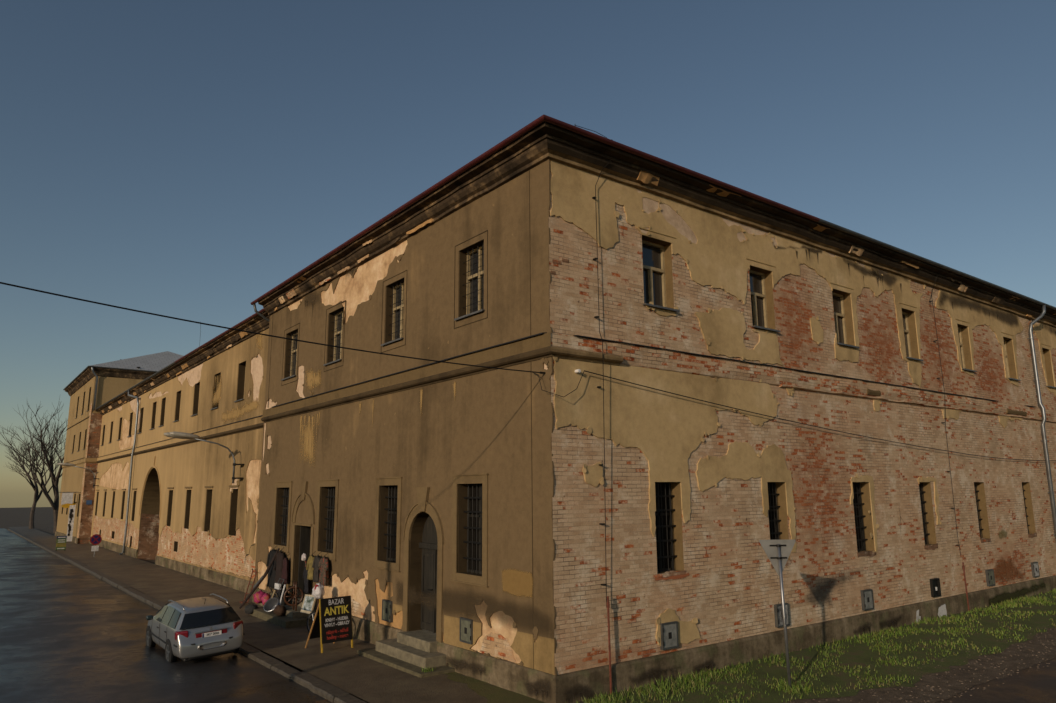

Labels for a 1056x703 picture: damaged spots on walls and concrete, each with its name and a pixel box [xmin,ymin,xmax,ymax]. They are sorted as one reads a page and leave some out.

flaking render [102,352,210,450]
flaking render [247,354,277,409]
flaking render [275,289,302,311]
flaking render [296,366,305,398]
flaking render [319,236,407,324]
flaking render [550,160,926,388]
flaking render [935,284,1056,396]
flaking render [99,462,129,490]
flaking render [157,423,272,590]
flaking render [541,357,797,553]
flaking render [321,570,403,629]
flaking render [471,613,523,666]